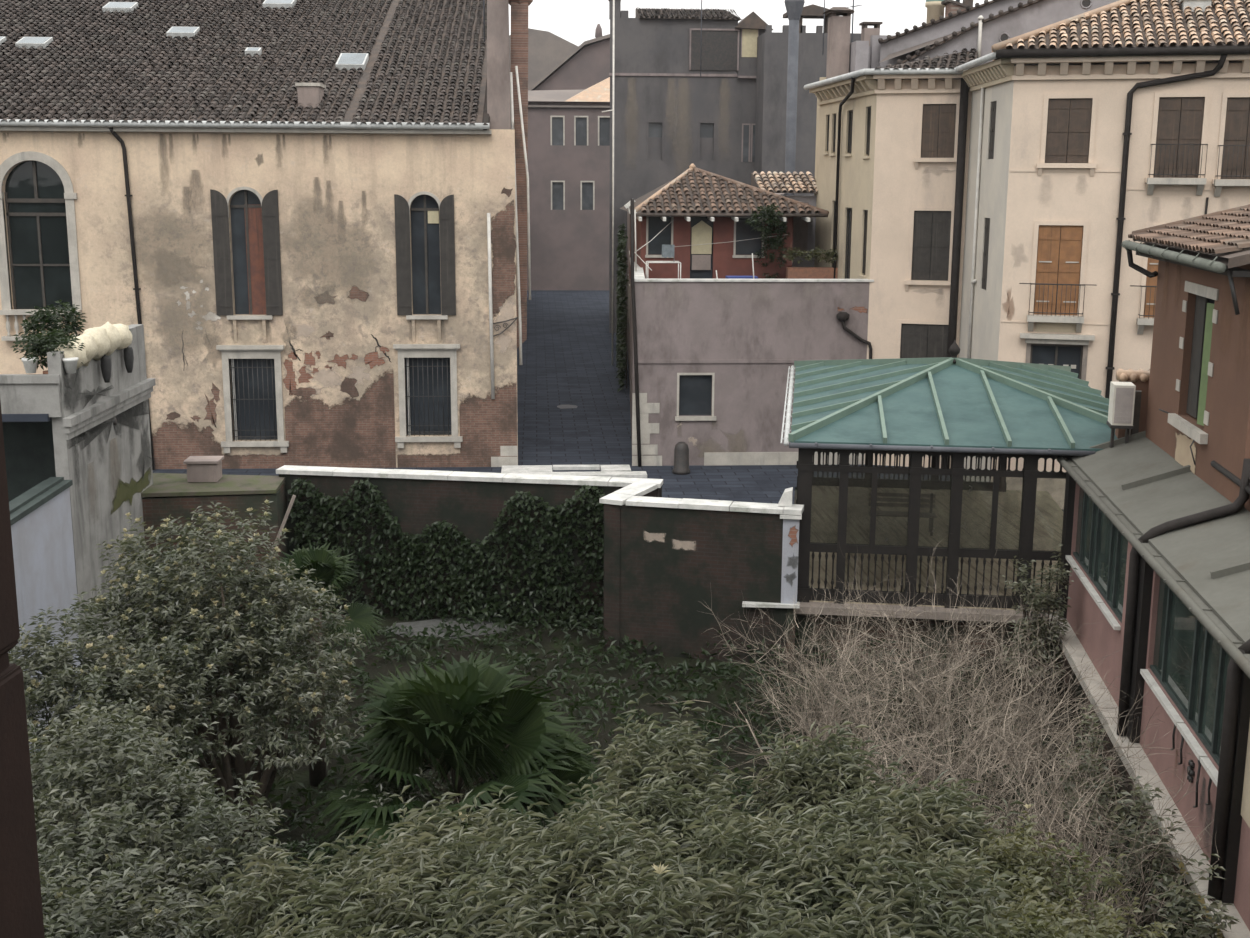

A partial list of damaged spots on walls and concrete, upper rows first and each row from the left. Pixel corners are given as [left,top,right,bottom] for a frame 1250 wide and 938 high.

flaking render [314,286,369,304]
flaking render [491,188,516,351]
flaking render [152,331,517,469]